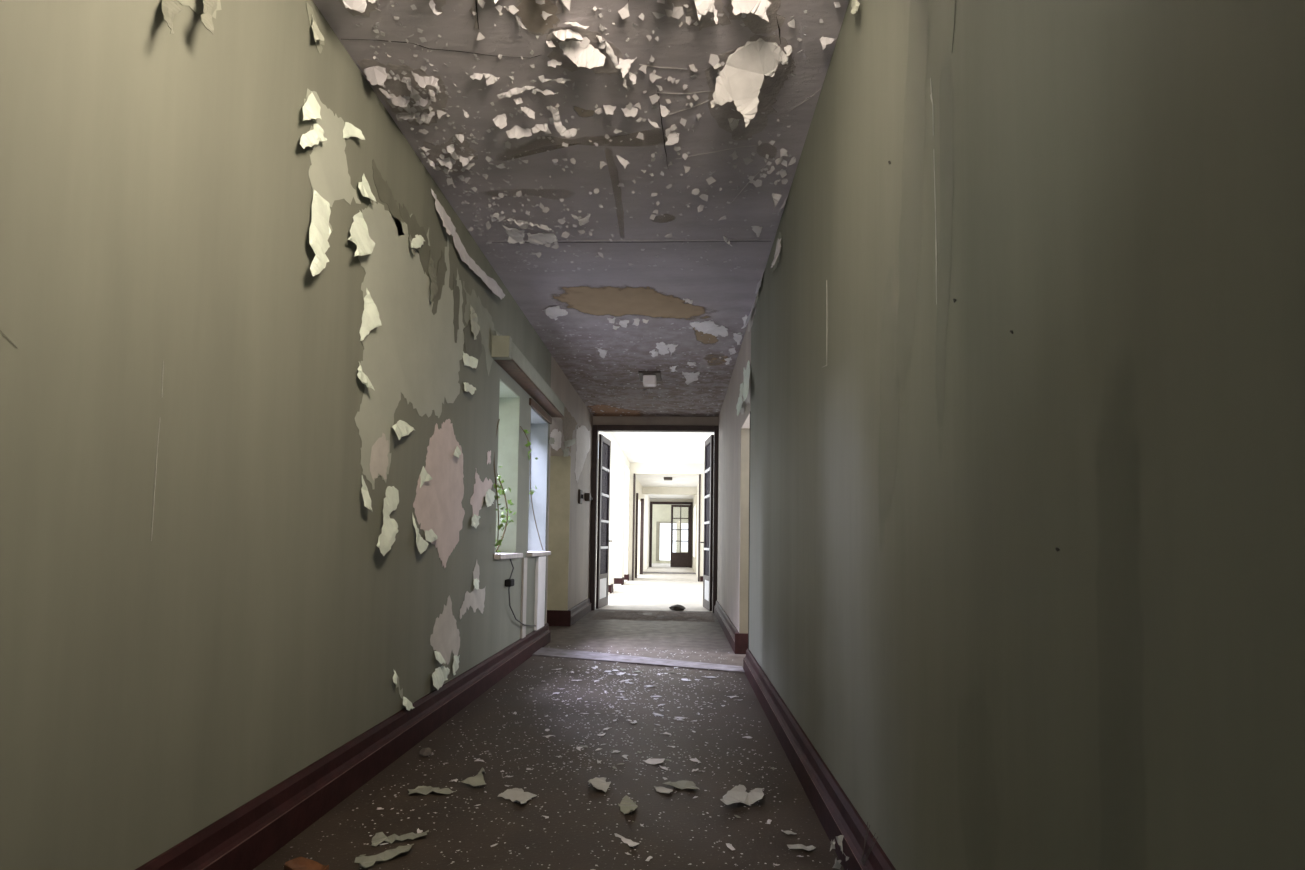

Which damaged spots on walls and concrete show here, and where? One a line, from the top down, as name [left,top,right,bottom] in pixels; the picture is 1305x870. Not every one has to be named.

peeling [306,2,325,54]
peeling [339,0,378,17]
peeling [357,59,449,126]
peeling [470,0,636,139]
peeling [603,105,679,146]
peeling [667,0,796,141]
peeling [820,36,835,49]
peeling [834,0,860,14]
peeling [300,88,505,568]
damp [553,286,718,344]
peeling [690,232,782,416]
peeling [430,560,485,690]